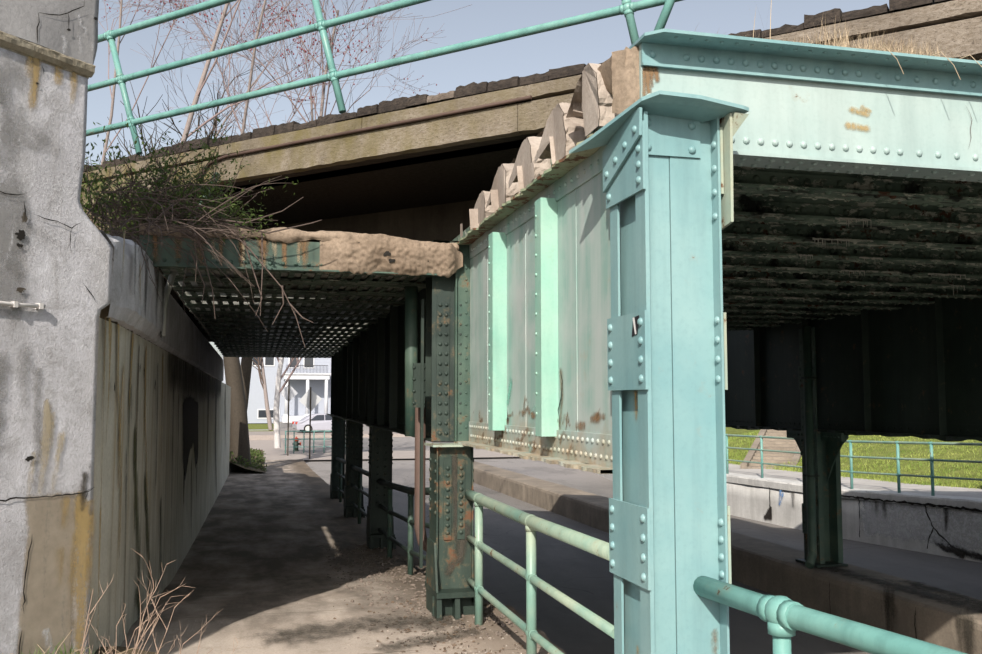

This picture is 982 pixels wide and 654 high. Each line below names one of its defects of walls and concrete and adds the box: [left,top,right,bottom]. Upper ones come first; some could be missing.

crack [37,6,84,42]
corrosion [846,106,871,131]
crack [0,191,82,253]
corrosion [557,413,604,452]
crack [0,488,93,502]
crack [841,495,982,554]
crack [18,540,32,654]